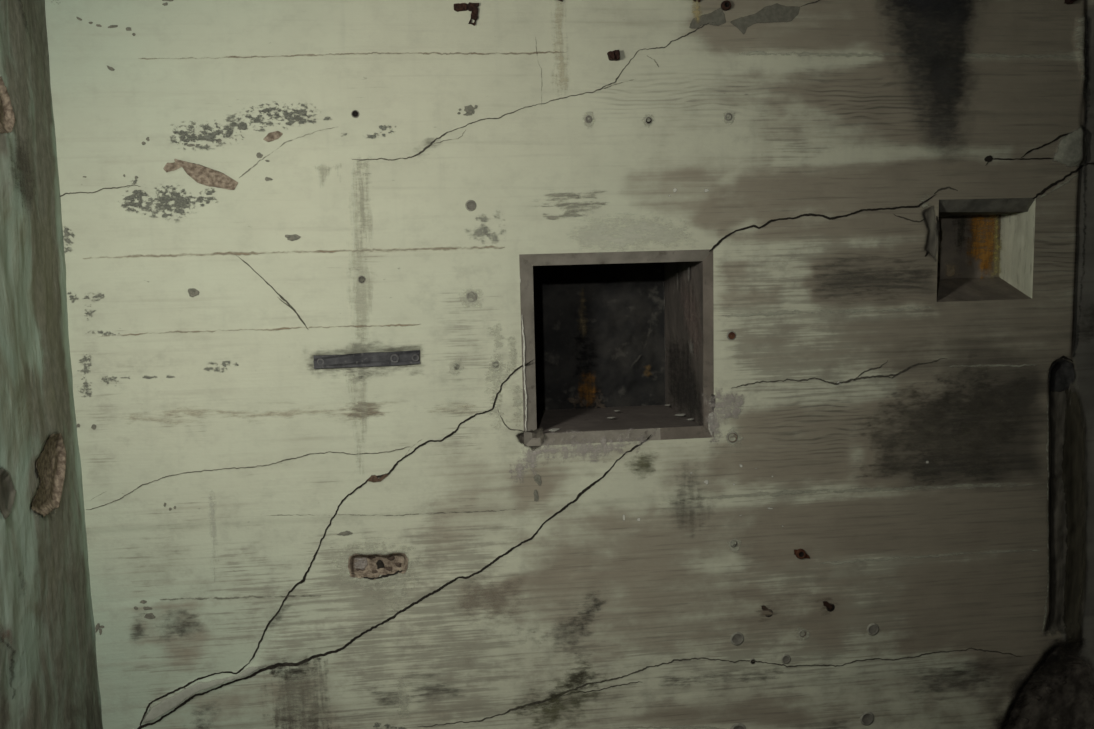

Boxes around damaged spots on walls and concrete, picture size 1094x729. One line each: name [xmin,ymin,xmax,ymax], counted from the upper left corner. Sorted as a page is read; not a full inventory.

crack [353,22,714,161]
peeling [170,103,331,149]
spalling [122,159,238,221]
crack [709,187,958,252]
crack [984,132,1093,199]
crack [732,358,945,388]
spalling [0,468,16,519]
spalling [31,433,66,517]
crack [86,359,651,729]
spalling [336,531,411,598]
crack [418,648,1023,727]